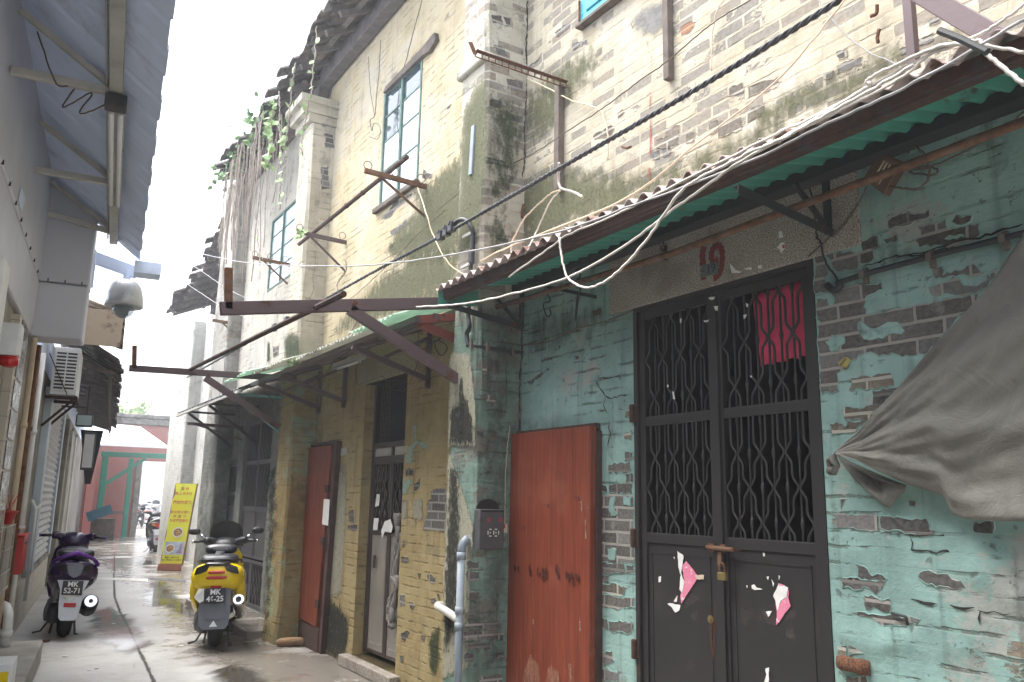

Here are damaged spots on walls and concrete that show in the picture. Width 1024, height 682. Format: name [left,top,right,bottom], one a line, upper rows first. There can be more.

peeling [813,209,998,437]
water stain [449,378,474,445]
crack [596,373,628,446]
peeling [405,468,448,533]
peeling [417,572,441,604]
water stain [443,467,460,652]
peeling [602,408,636,635]
peeling [839,563,921,627]
peeling [835,498,936,538]
peeling [918,569,966,590]
peeling [972,520,996,535]
water stain [326,599,349,658]